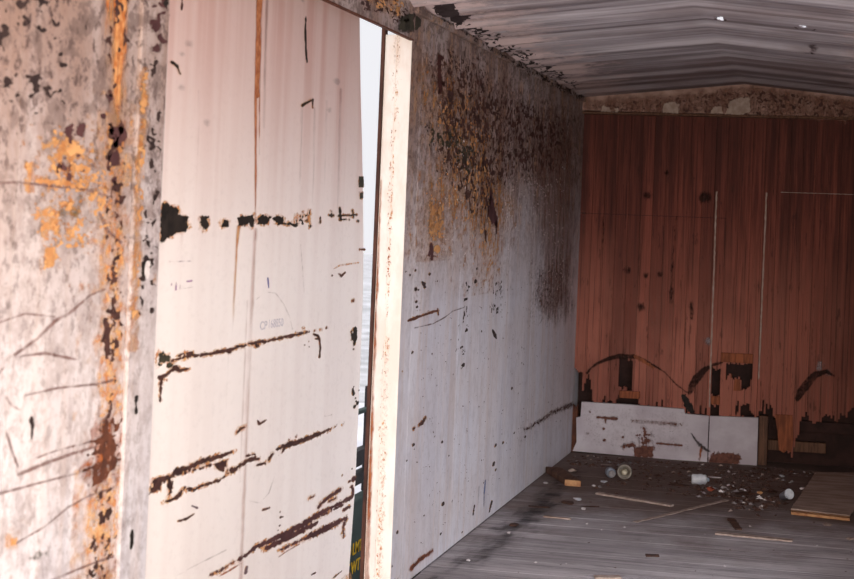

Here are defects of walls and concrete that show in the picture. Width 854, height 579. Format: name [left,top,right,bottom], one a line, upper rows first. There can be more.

peeling [0,0,61,51]
peeling [0,69,65,108]
peeling [105,0,130,103]
peeling [24,113,128,274]
peeling [129,0,210,323]
peeling [221,207,359,229]
peeling [417,3,584,384]
corrosion [75,0,132,579]
peeling [155,327,327,403]
peeling [149,424,342,503]
peeling [621,420,683,458]
peeling [209,468,356,576]